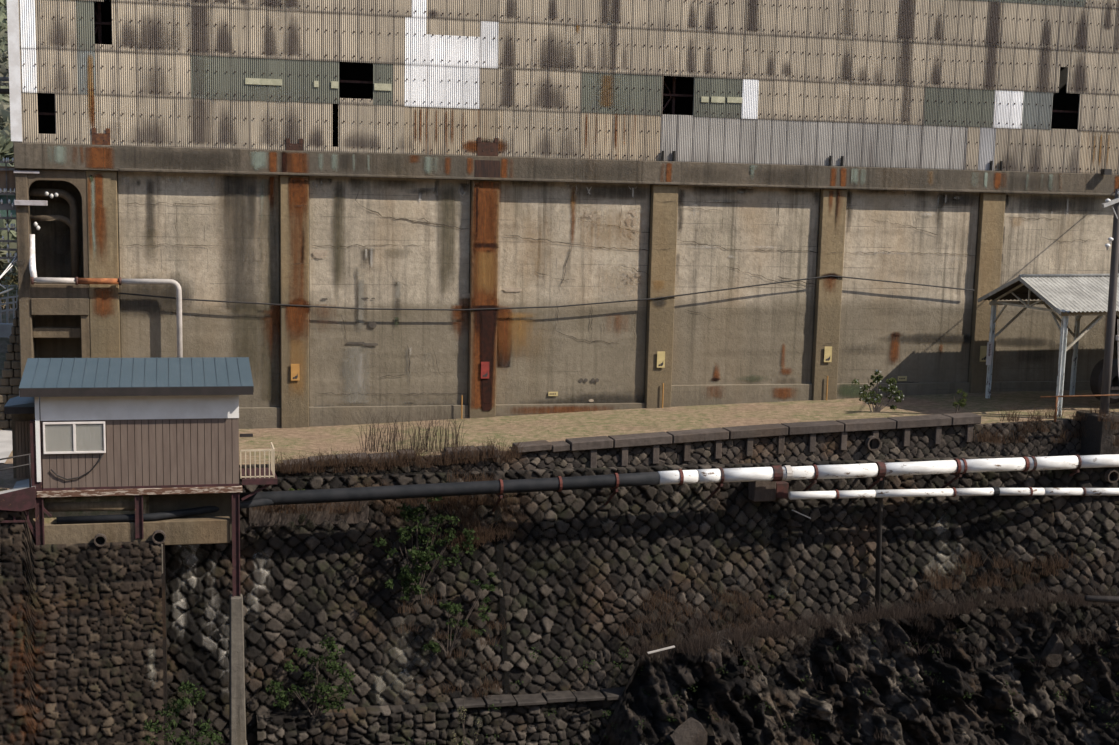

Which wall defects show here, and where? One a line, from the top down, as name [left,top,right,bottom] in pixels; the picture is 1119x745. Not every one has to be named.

water stain [192,0,232,53]
water stain [503,39,513,106]
water stain [899,0,915,121]
water stain [985,2,1000,88]
water stain [1073,11,1086,92]
corrosion [78,278,119,316]
corrosion [86,147,113,252]
corrosion [269,152,310,334]
water stain [311,132,376,282]
crack [289,192,468,264]
corrosion [436,110,526,411]
crack [493,201,977,344]